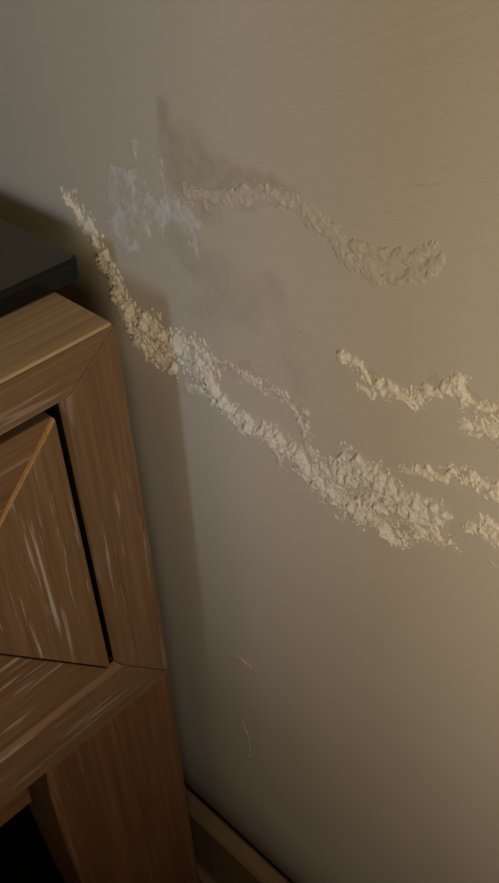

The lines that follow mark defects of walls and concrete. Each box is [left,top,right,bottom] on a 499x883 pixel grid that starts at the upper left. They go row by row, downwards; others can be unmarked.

water stain [60,186,499,568]